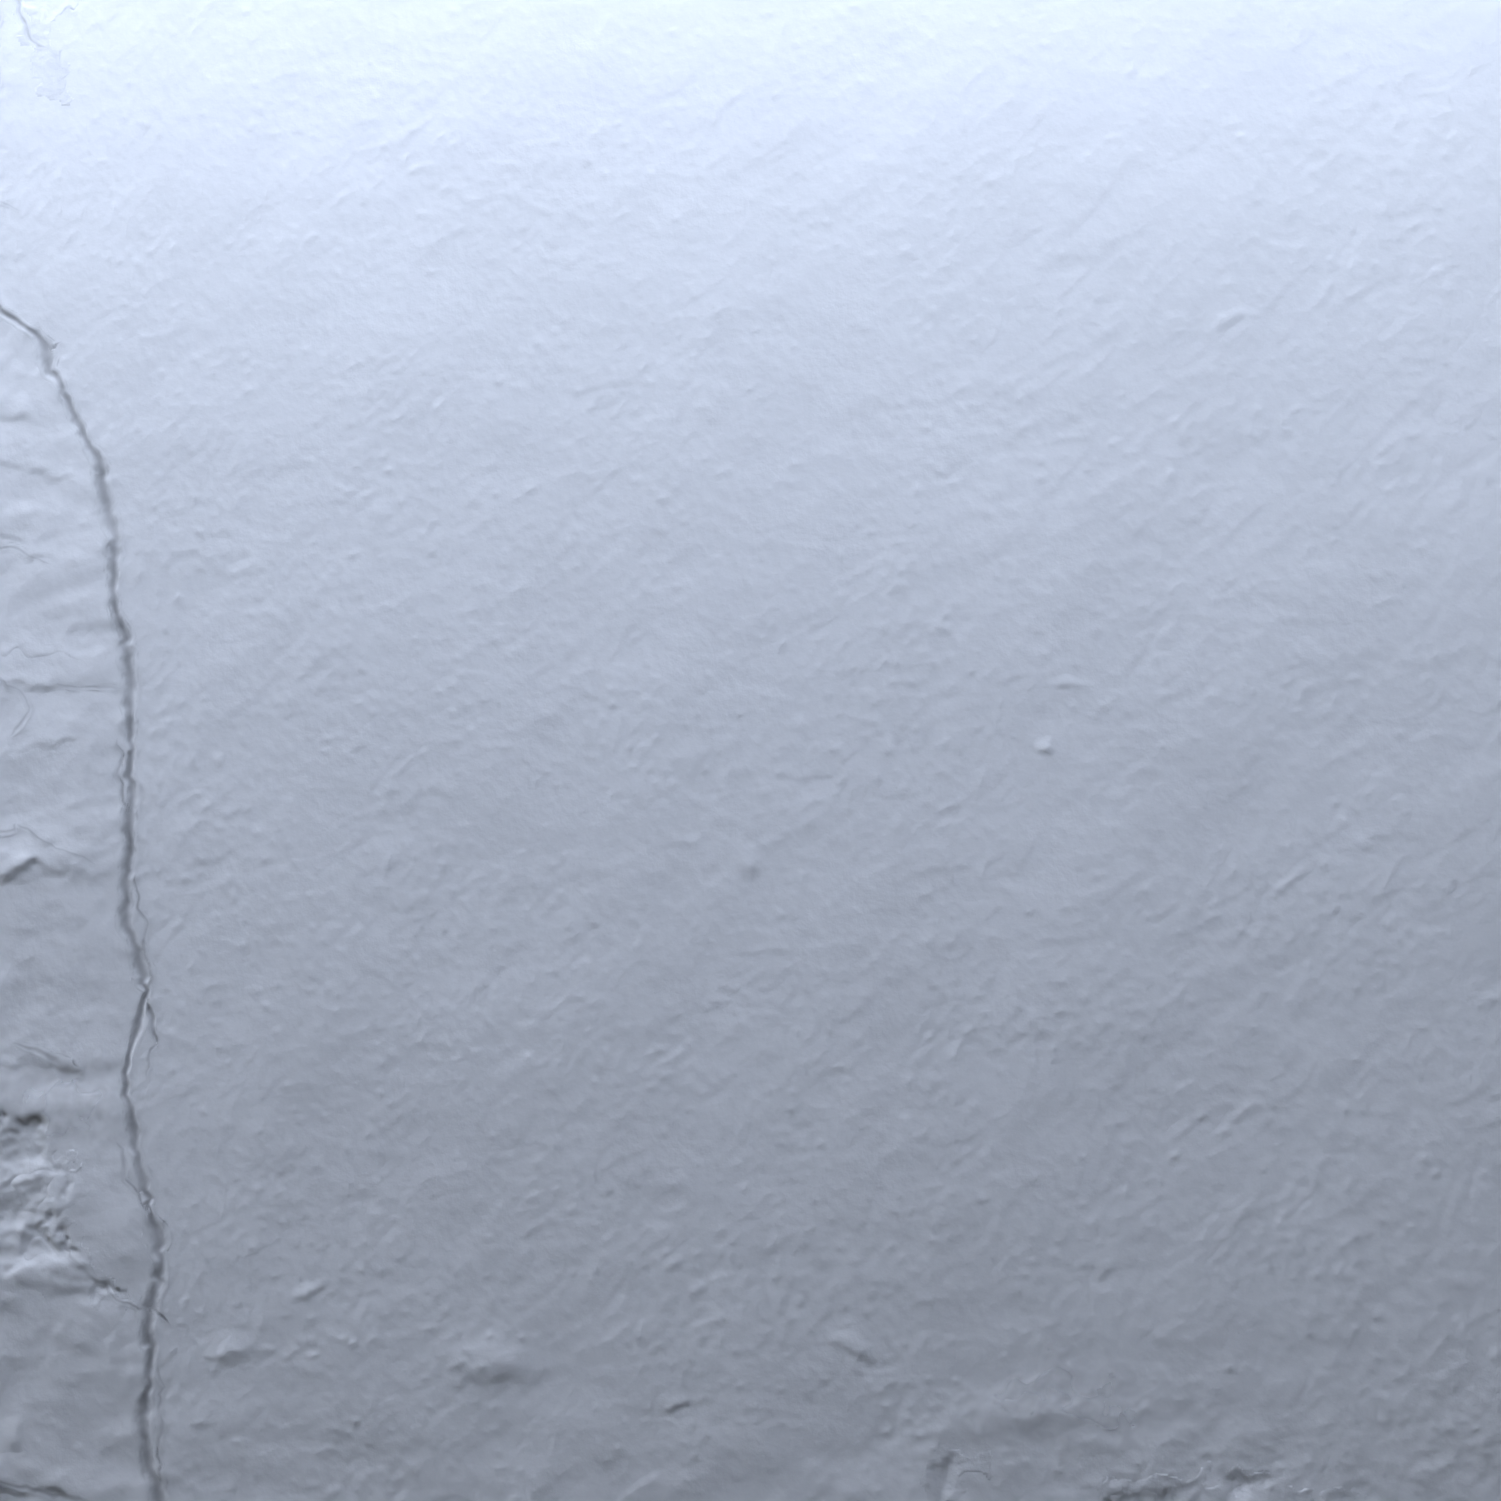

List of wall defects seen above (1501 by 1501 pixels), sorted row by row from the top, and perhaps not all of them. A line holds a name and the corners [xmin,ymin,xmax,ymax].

crack [0,0,47,89]
crack [0,292,172,1501]
flaking render [0,1120,130,1311]